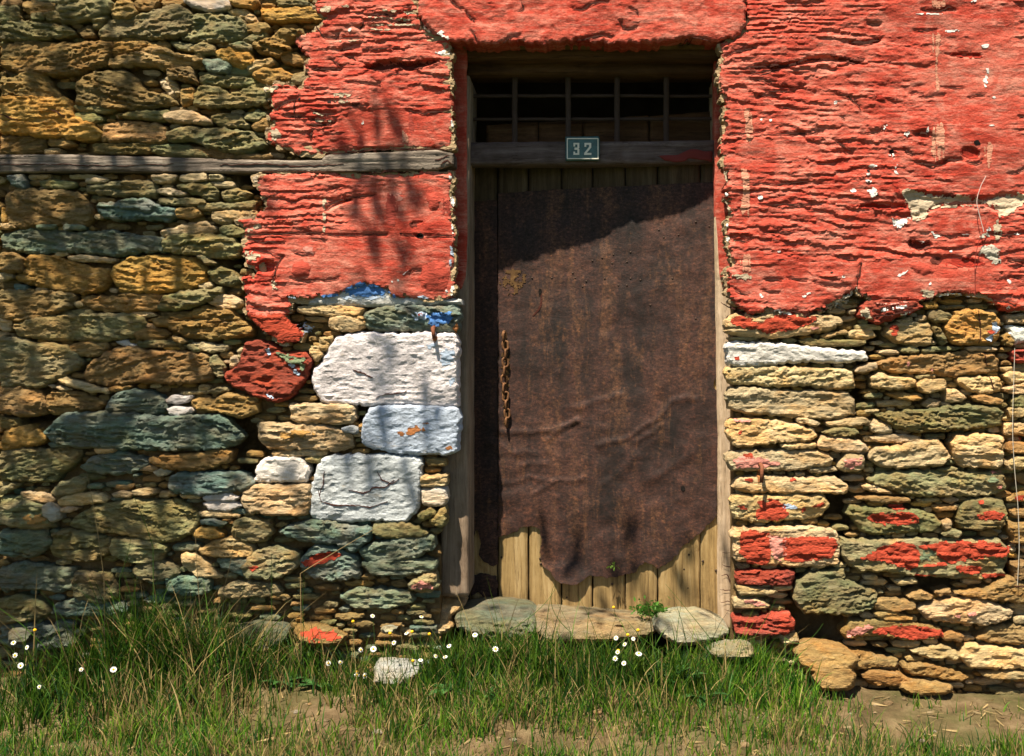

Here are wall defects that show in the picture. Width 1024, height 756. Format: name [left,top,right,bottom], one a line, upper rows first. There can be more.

spalling [850,153,1024,270]
rust [499,268,526,295]
spalling [920,282,976,298]
spalling [860,305,910,320]
crack [318,471,398,508]